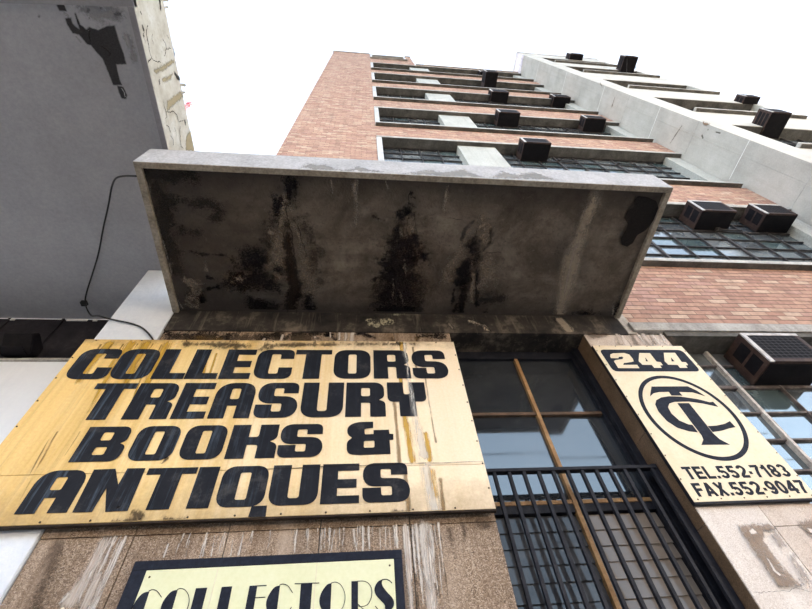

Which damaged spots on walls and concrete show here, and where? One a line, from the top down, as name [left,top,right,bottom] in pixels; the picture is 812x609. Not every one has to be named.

peeling [57,5,136,99]
leakage [143,168,285,310]
leakage [370,192,506,331]
spalling [621,196,658,247]
leakage [162,331,374,341]
leakage [416,323,453,341]
efflorescence [200,531,254,557]
efflorescence [294,526,373,552]
efflorescence [380,520,448,609]